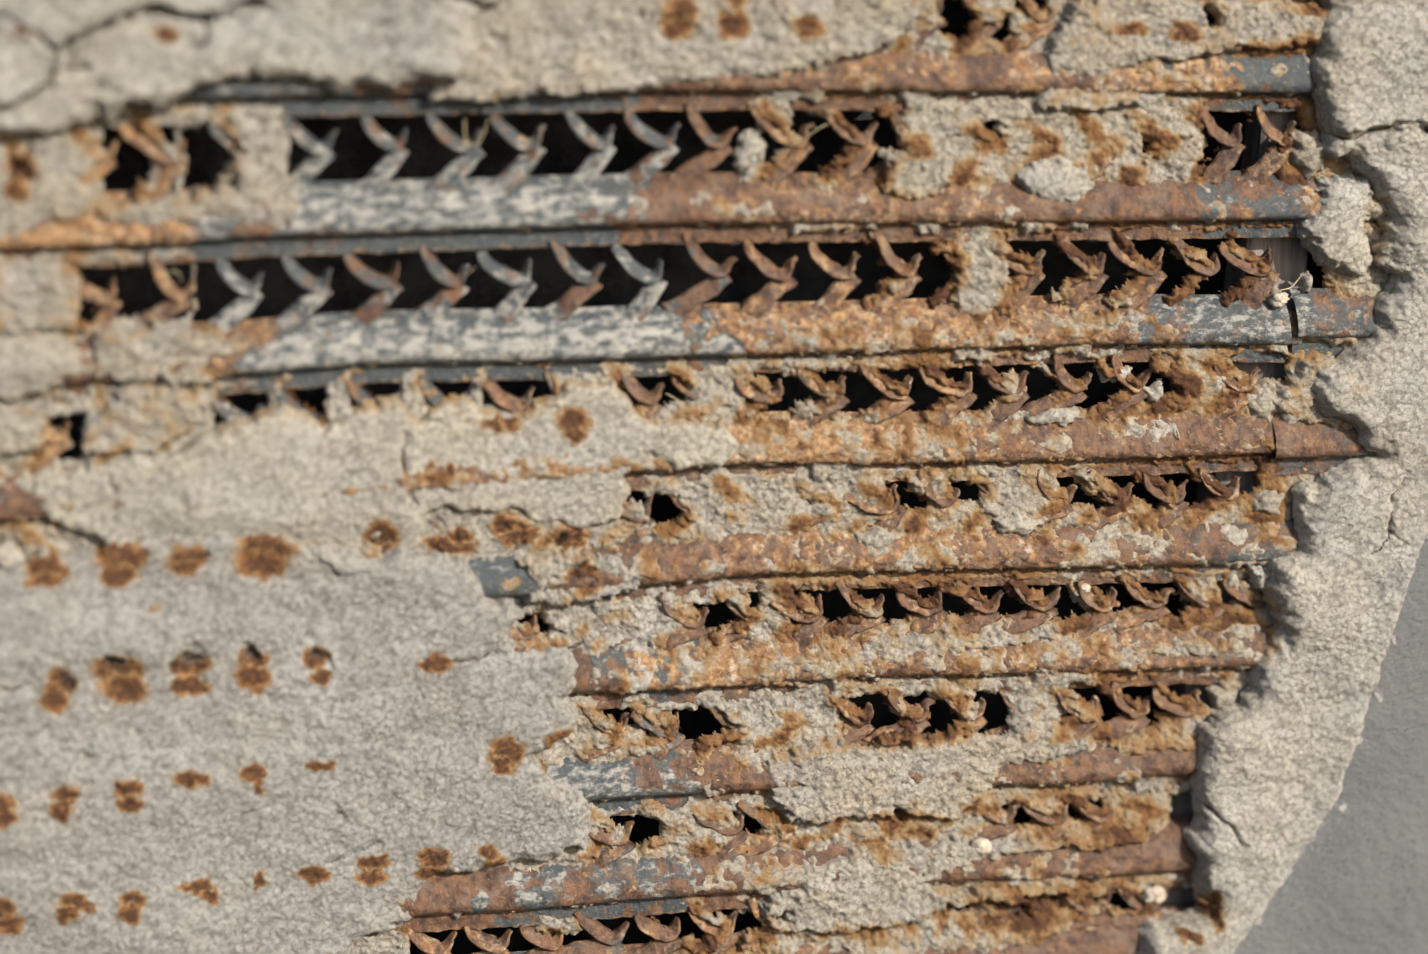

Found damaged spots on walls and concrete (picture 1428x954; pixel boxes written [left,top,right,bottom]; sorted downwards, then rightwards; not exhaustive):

spalling [0,98,301,239]
spalling [425,0,1330,312]
spalling [1187,92,1392,307]
corrosion [554,406,594,445]
corrosion [92,540,211,588]
corrosion [234,534,300,582]
corrosion [421,512,604,599]
spalling [0,194,1363,954]
corrosion [39,654,151,716]
corrosion [232,644,272,694]
corrosion [486,724,576,776]
corrosion [1172,892,1226,947]